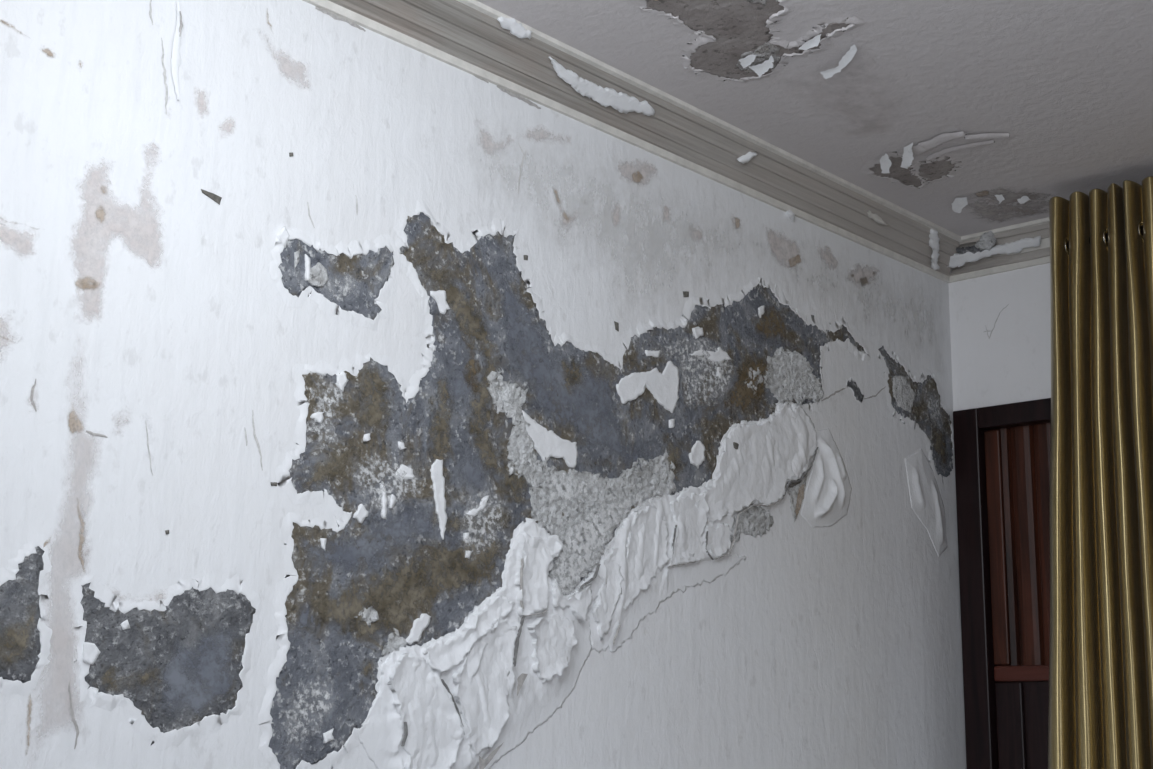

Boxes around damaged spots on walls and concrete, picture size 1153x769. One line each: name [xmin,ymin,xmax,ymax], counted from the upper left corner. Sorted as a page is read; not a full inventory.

flaking render [633,0,867,83]
peeling [549,57,655,116]
flaking render [861,131,1010,191]
peeling [952,197,968,213]
peeling [995,195,1031,204]
flaking render [66,199,955,769]
flaking render [0,530,54,696]